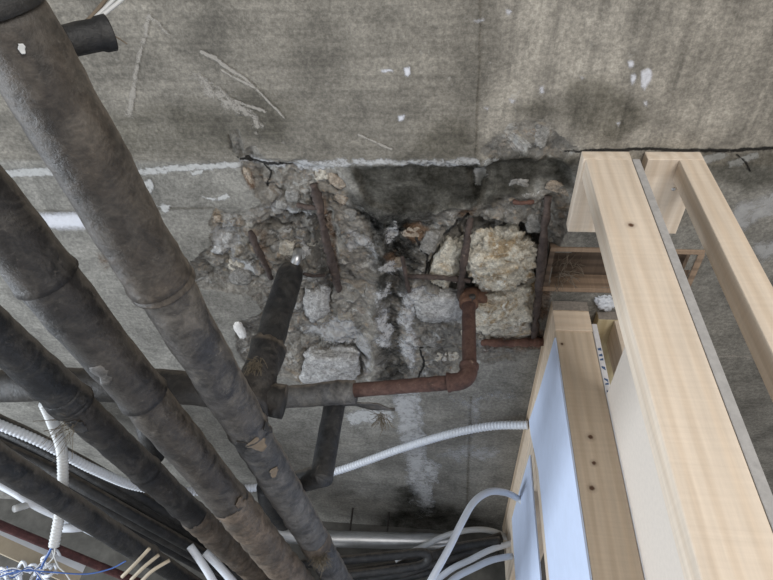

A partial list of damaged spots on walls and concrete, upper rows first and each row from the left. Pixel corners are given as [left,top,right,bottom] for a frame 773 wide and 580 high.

damp [5,167,53,177]
crack [237,155,291,186]
crack [564,146,773,172]
damp [138,155,572,380]
spalling [190,129,571,384]
damp [346,393,485,530]